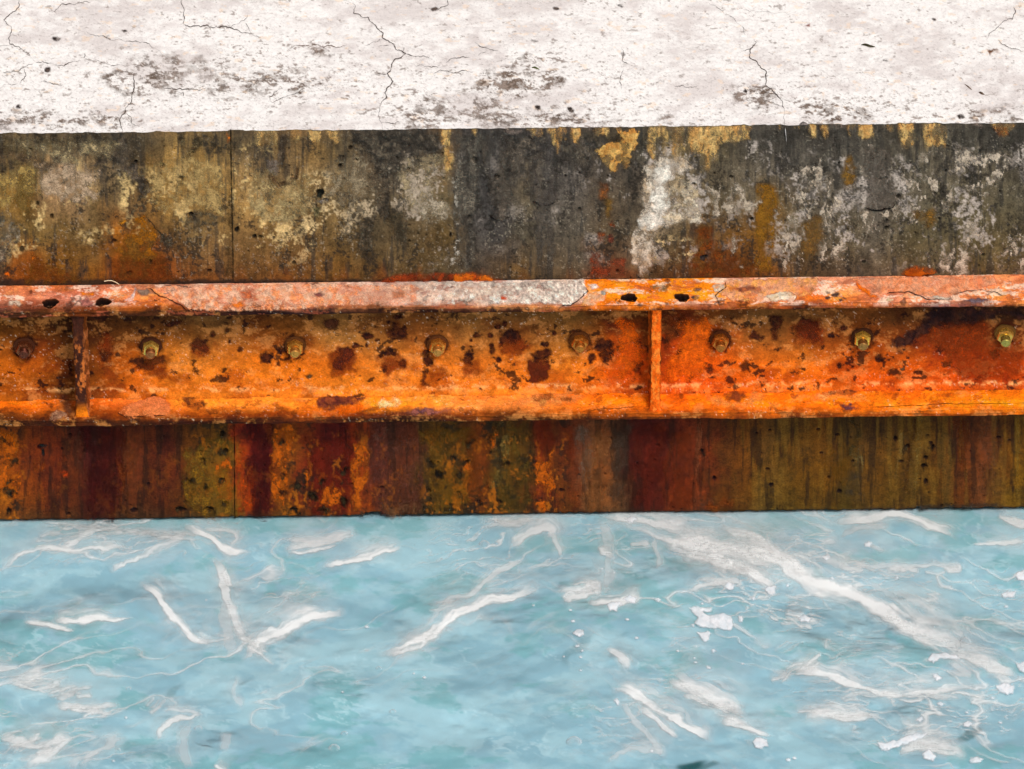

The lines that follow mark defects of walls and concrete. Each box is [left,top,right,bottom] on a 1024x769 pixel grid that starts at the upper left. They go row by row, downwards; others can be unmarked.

crack [3,2,153,131]
damp [94,133,152,198]
crack [181,3,252,34]
crack [293,6,492,130]
damp [352,129,481,269]
damp [504,125,750,273]
rust [690,184,818,303]
crack [745,41,785,125]
damp [899,123,946,146]
rust [137,255,626,377]
rust [462,318,645,384]
rust [853,266,1024,380]